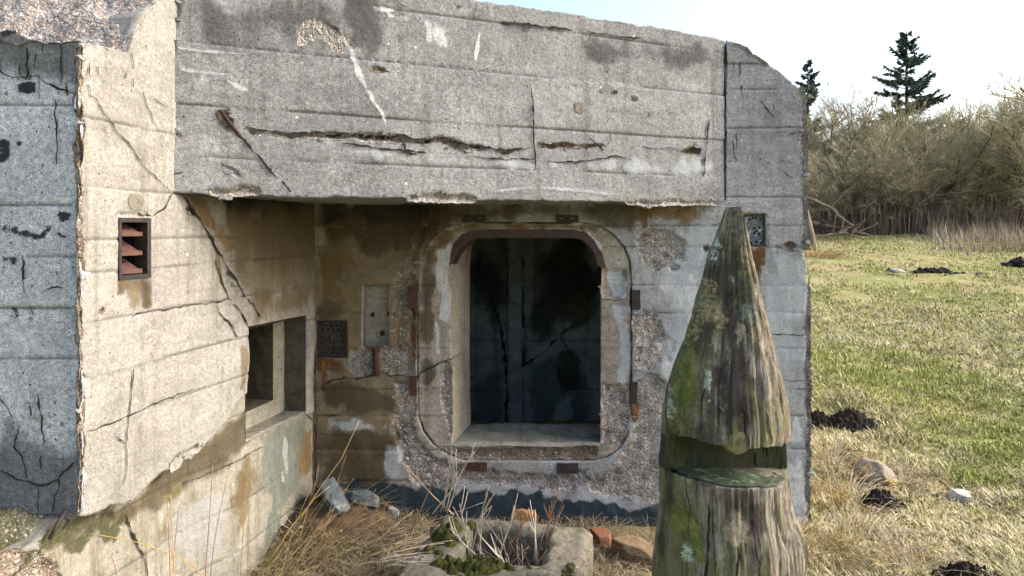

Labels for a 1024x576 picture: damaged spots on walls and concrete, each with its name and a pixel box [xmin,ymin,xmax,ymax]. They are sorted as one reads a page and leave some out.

crack [0,45,260,336]
corrosion [118,280,151,307]
corrosion [219,109,244,139]
spalling [406,190,477,204]
crack [243,89,680,192]
spalling [633,226,687,272]
corrosion [747,212,770,279]
crack [0,396,74,511]
crack [88,352,192,483]
damp [114,412,246,522]
corrosion [316,358,345,391]
spalling [346,239,677,506]